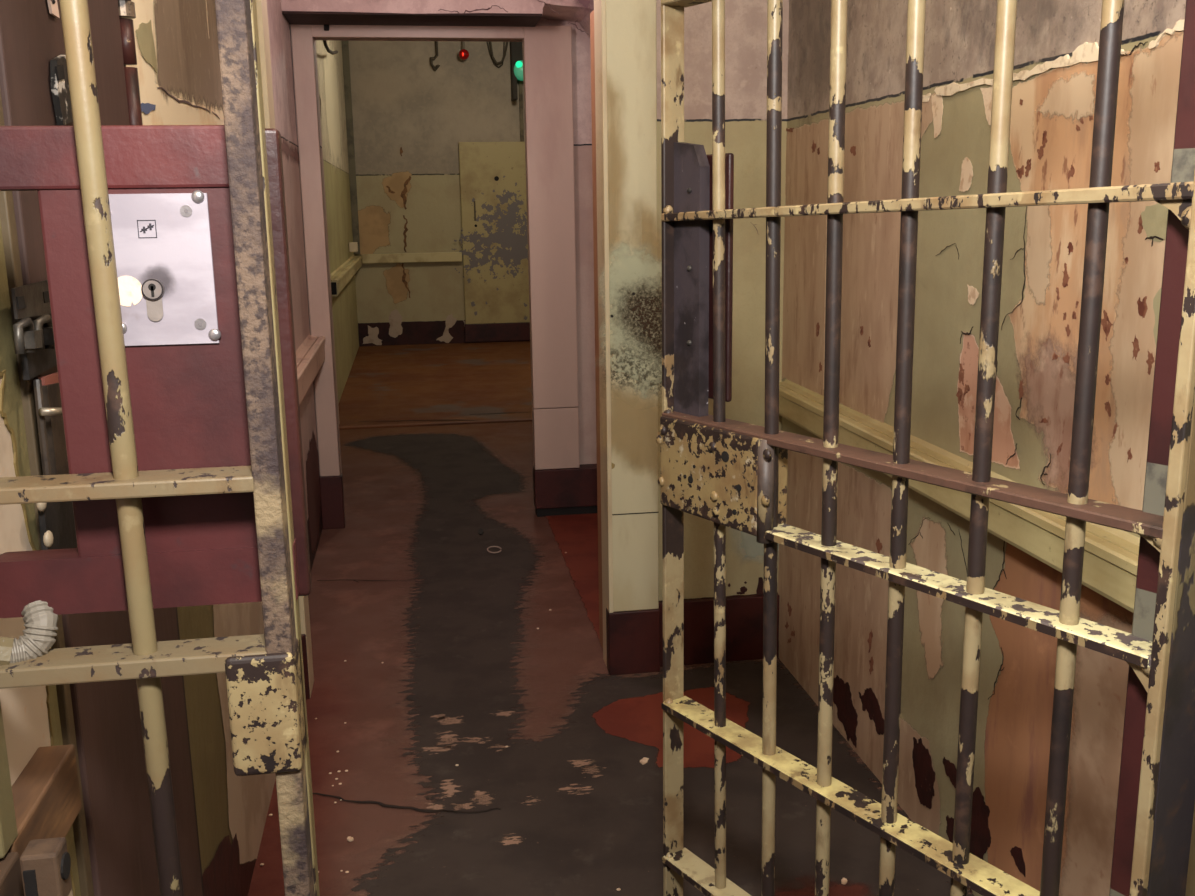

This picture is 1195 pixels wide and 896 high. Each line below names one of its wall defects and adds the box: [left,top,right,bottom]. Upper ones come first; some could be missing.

peeling [126,0,224,125]
peeling [1111,19,1185,186]
damp [609,246,662,397]
peeling [839,101,904,423]
peeling [991,42,1099,494]
peeling [1088,201,1168,510]
peeling [0,504,37,555]
peeling [345,433,663,896]
peeling [994,543,1062,611]
peeling [1079,584,1133,634]
peeling [683,756,880,896]
peeling [984,615,1058,891]